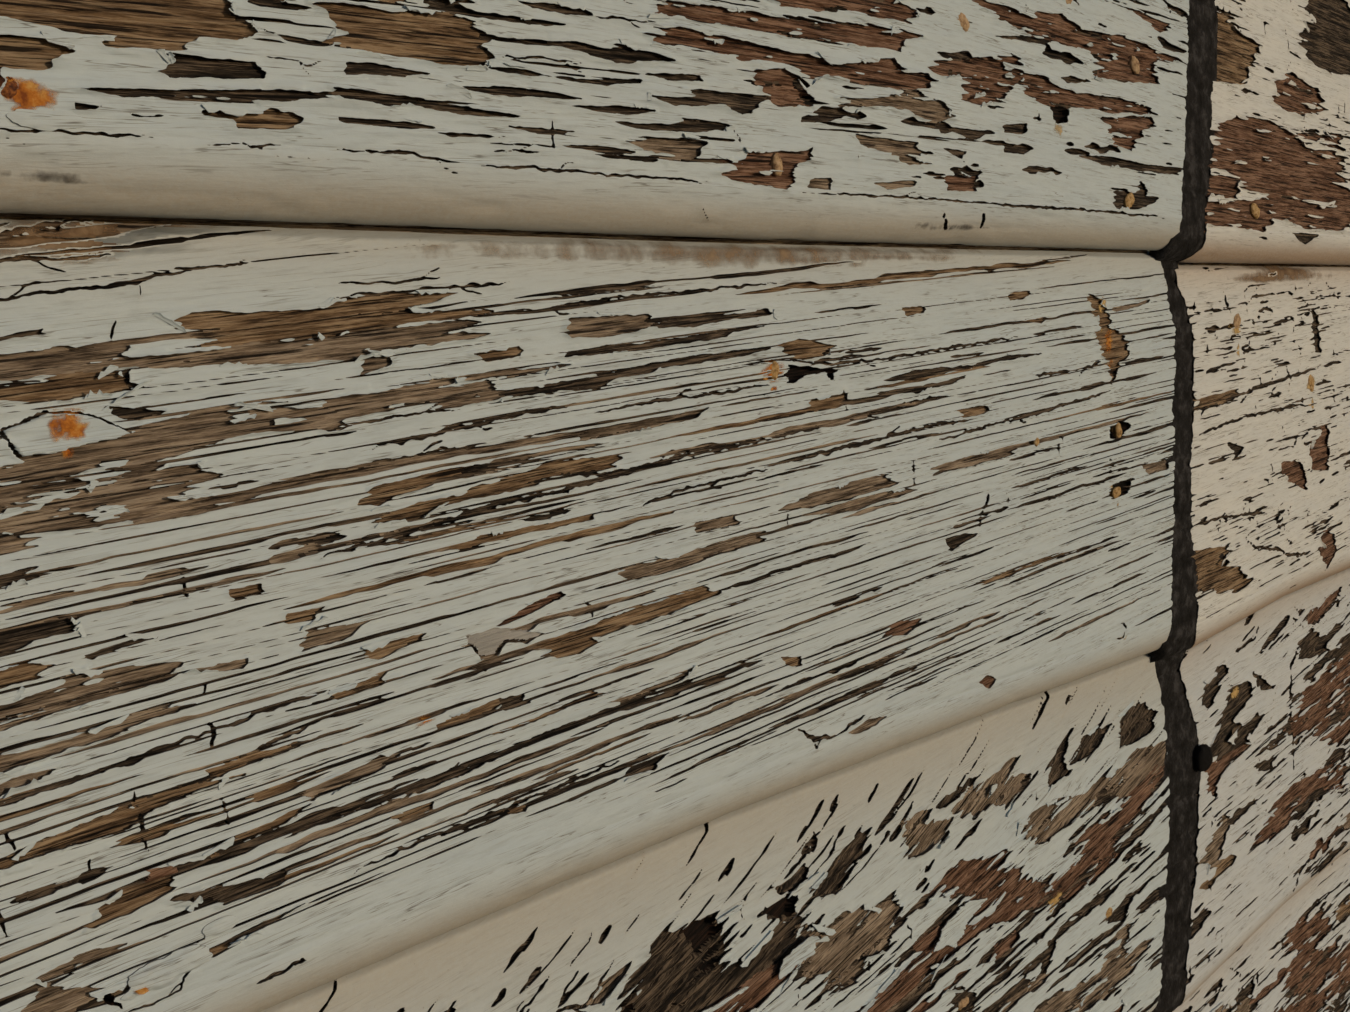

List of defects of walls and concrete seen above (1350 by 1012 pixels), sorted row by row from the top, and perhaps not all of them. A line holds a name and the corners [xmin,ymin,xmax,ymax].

rust [7,79,55,110]
crack [231,0,352,96]
crack [0,89,740,184]
crack [478,33,639,98]
peeling [0,0,1185,210]
crack [596,0,1186,219]
peeling [1204,116,1350,244]
peeling [1297,0,1350,75]
rust [49,409,87,457]
crack [0,226,1350,1012]
peeling [84,751,400,928]
peeling [586,701,1166,1012]